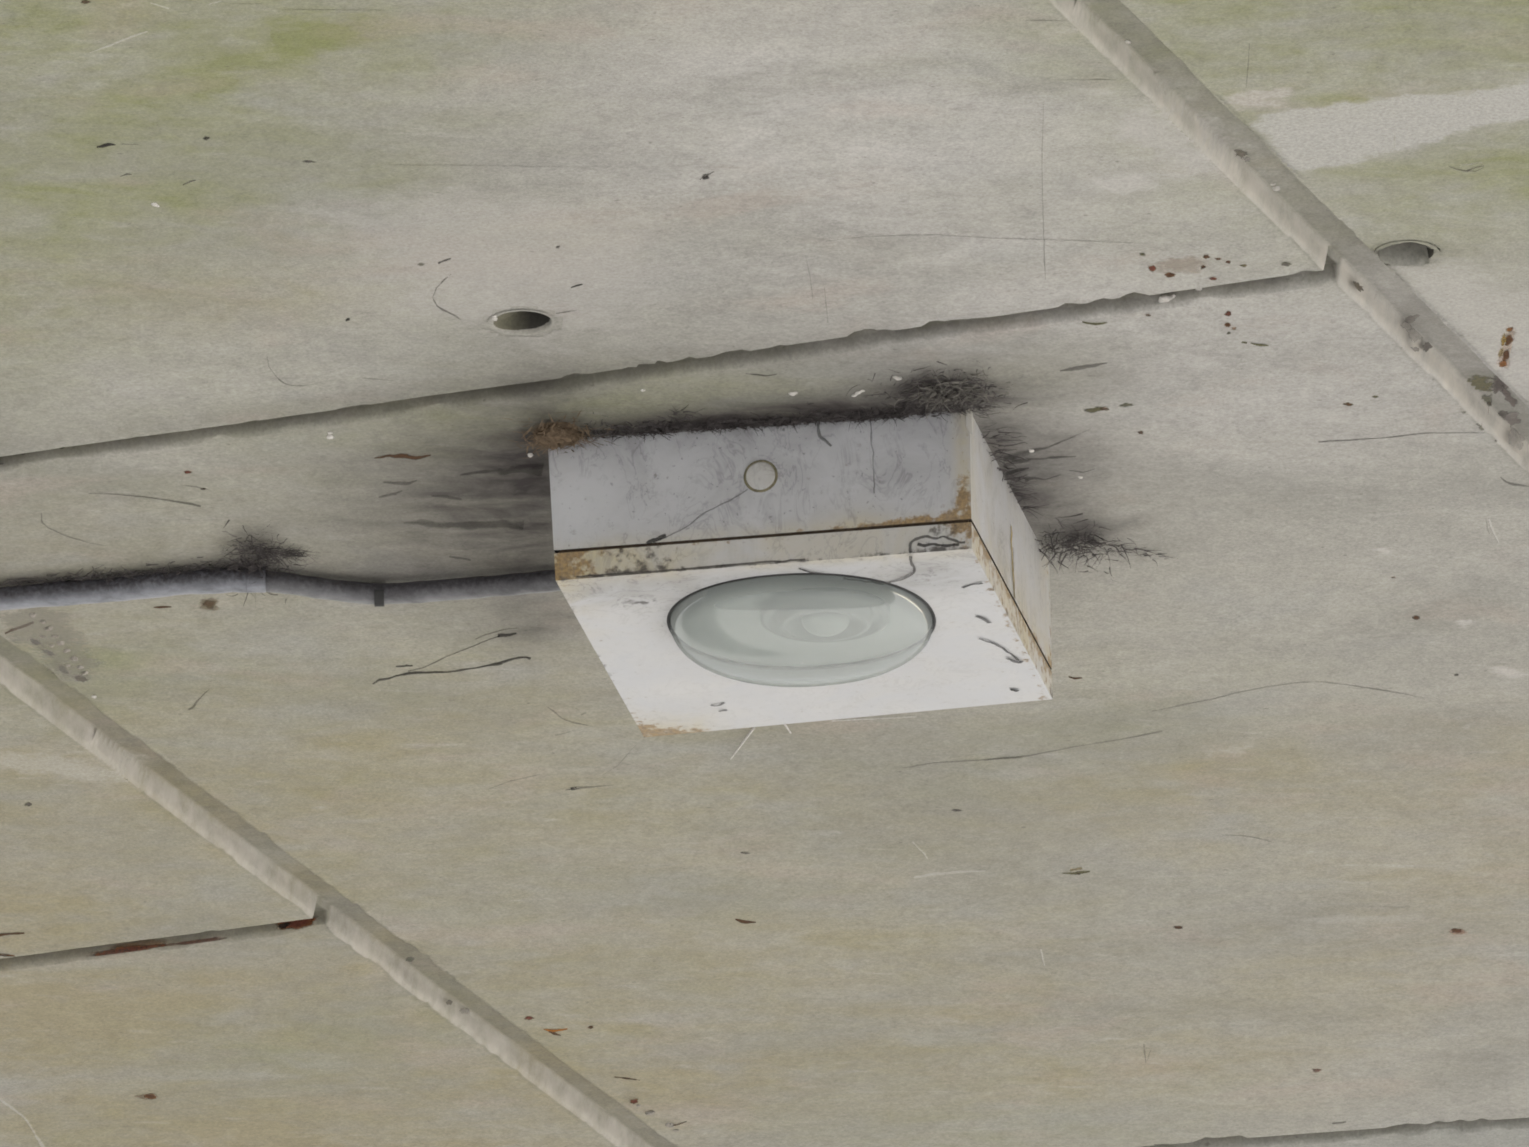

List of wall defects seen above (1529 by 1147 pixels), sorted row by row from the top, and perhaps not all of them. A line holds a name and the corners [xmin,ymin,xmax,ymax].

leakage [1049,71,1529,202]
corrosion [1498,327,1513,367]
crack [373,633,531,684]
corrosion [277,918,315,930]
corrosion [92,937,226,956]